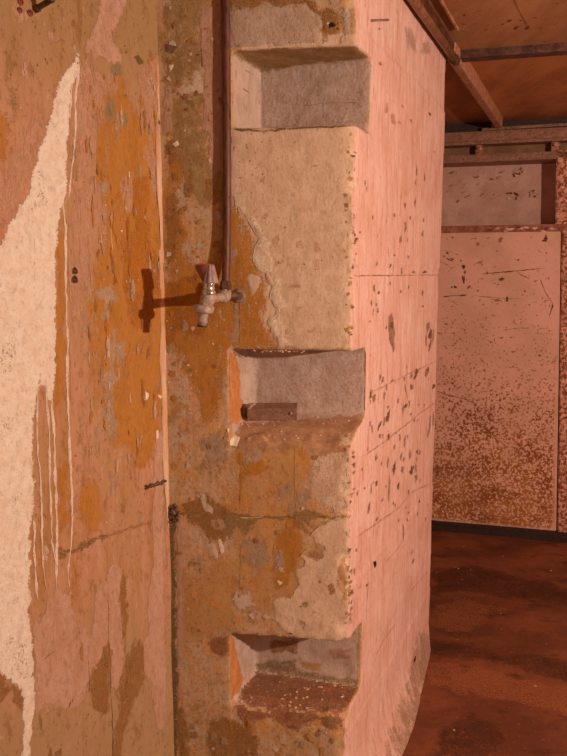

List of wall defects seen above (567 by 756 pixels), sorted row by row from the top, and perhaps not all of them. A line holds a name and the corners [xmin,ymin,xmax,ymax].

flaking render [0,0,436,756]
rust [432,300,555,528]